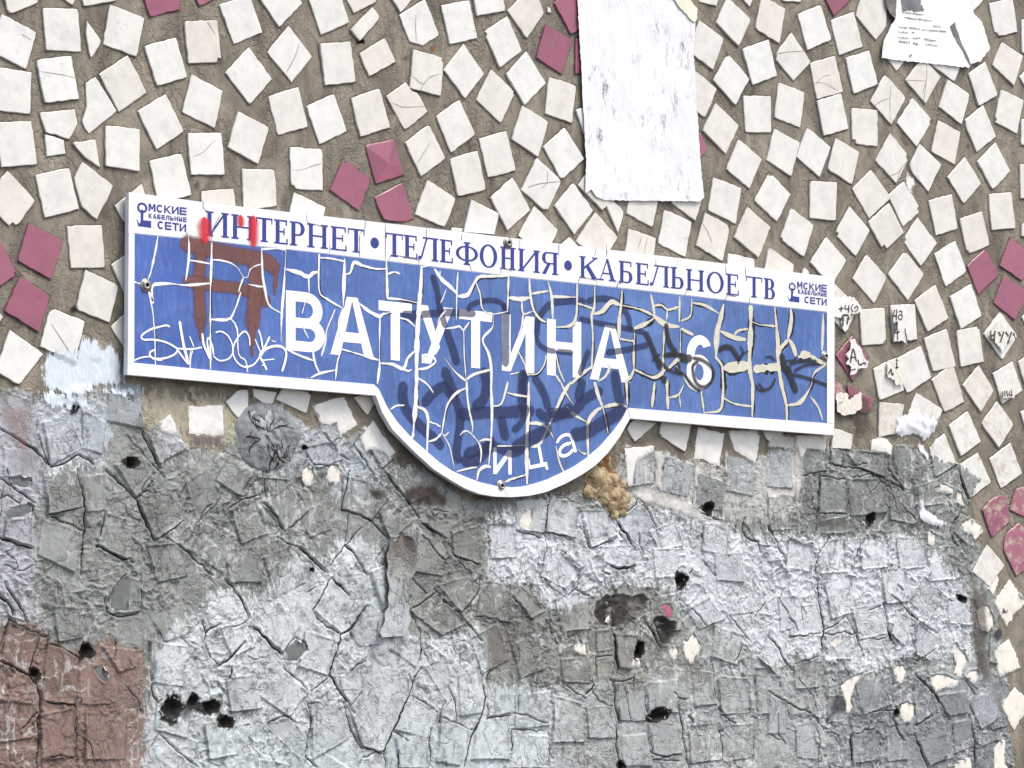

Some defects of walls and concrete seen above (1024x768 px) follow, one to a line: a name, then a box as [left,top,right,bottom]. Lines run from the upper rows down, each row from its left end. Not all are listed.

crack [0,419,557,767]
crack [516,494,660,599]
spalling [599,597,640,625]
crack [690,445,975,767]
crack [568,618,659,760]
crack [651,693,693,764]